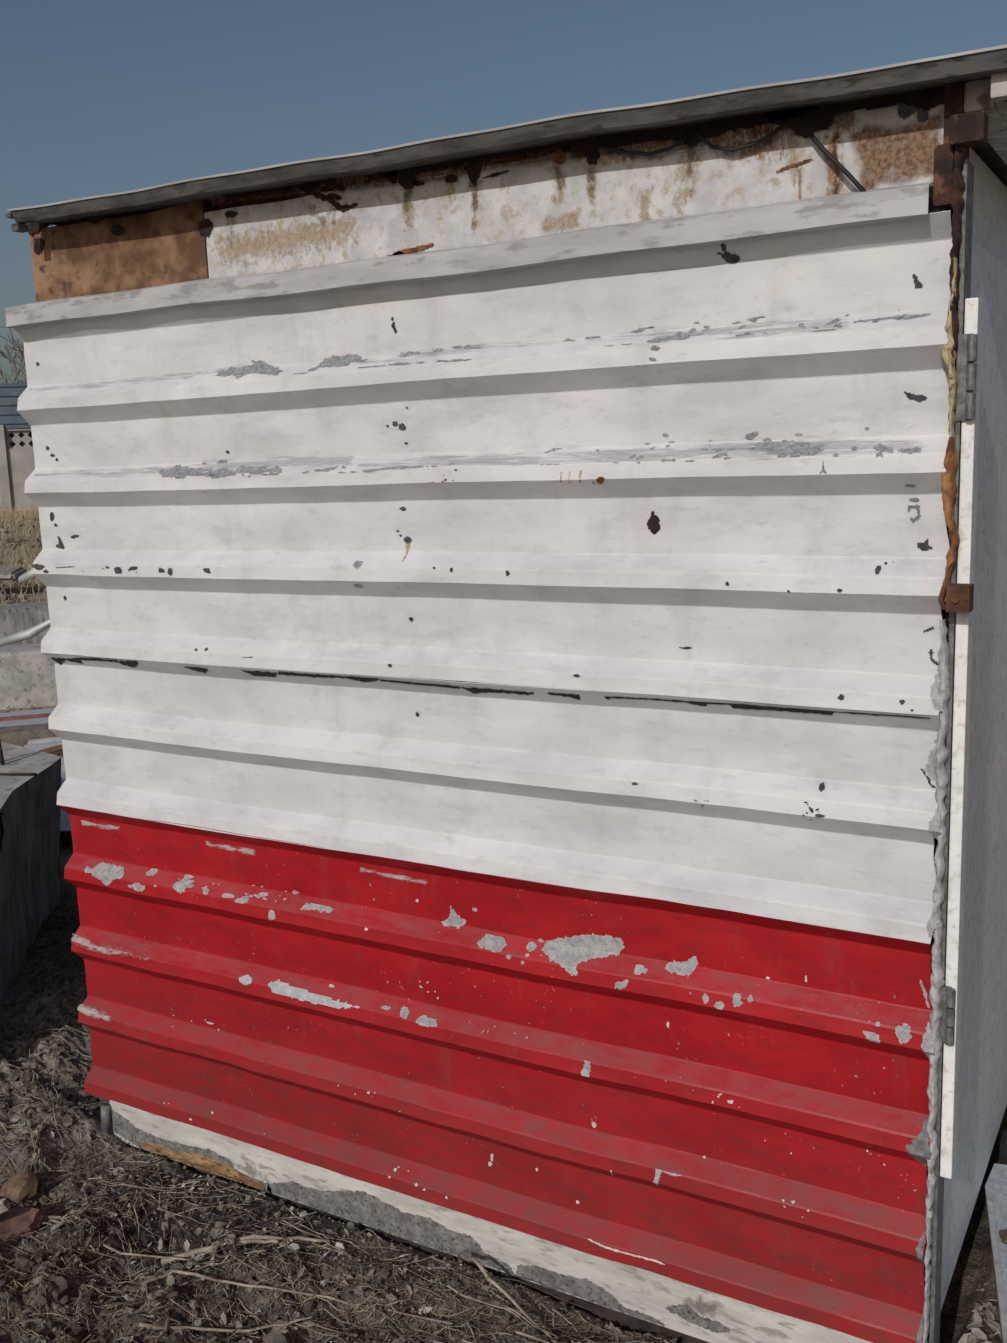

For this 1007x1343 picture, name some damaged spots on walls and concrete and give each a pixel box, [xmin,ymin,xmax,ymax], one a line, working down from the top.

corrosion [211,86,945,268]
corrosion [27,214,108,235]
peeling [564,309,931,361]
peeling [39,345,498,390]
peeling [34,427,922,479]
peeling [84,862,158,892]
peeling [173,874,333,920]
peeling [441,906,478,929]
peeling [477,933,625,976]
peeling [268,979,360,1009]